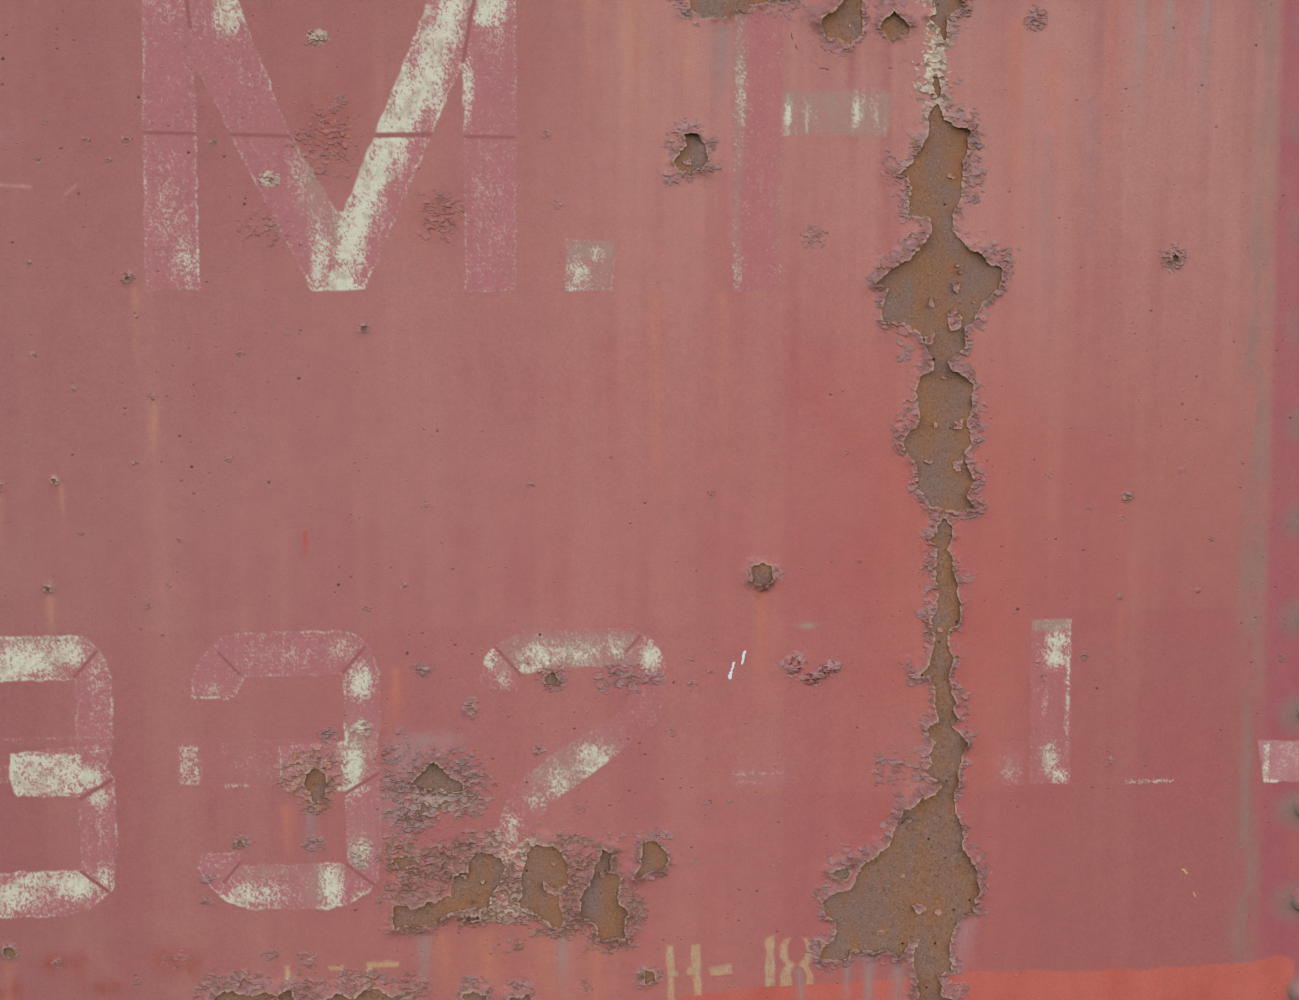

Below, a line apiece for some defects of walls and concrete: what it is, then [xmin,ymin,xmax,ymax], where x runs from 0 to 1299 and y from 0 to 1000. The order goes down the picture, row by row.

peeling [1022,4,1049,33]
peeling [1158,237,1192,274]
peeling [657,0,1022,1000]
peeling [592,654,668,700]
peeling [272,717,687,993]
peeling [192,948,543,1000]